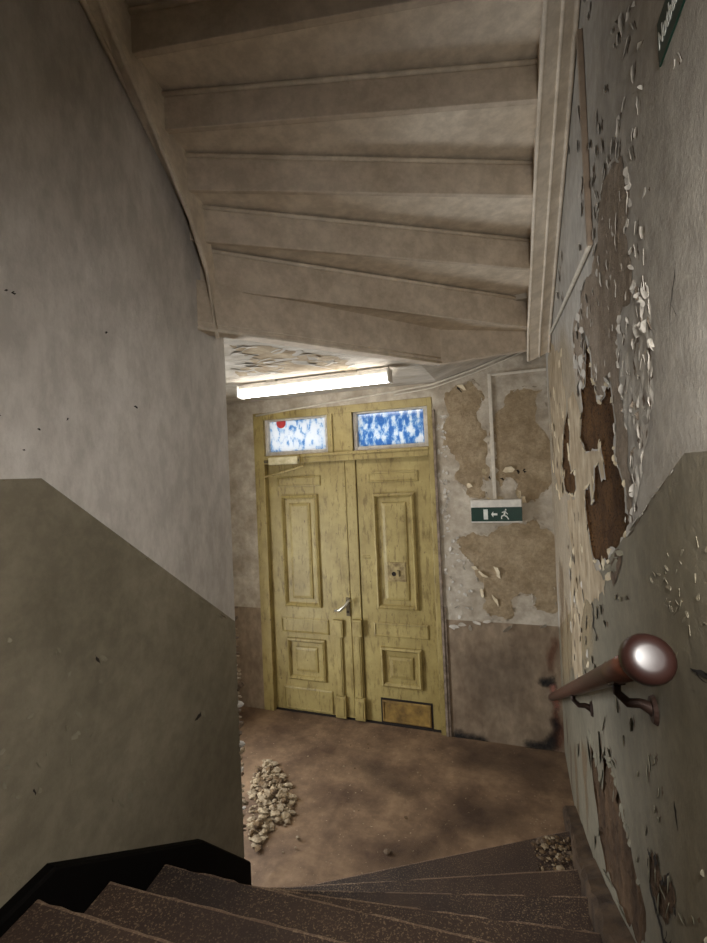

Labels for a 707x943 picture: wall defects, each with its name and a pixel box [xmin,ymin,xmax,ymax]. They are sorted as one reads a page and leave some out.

peeling [441,1,675,679]
flaking render [579,696,701,943]